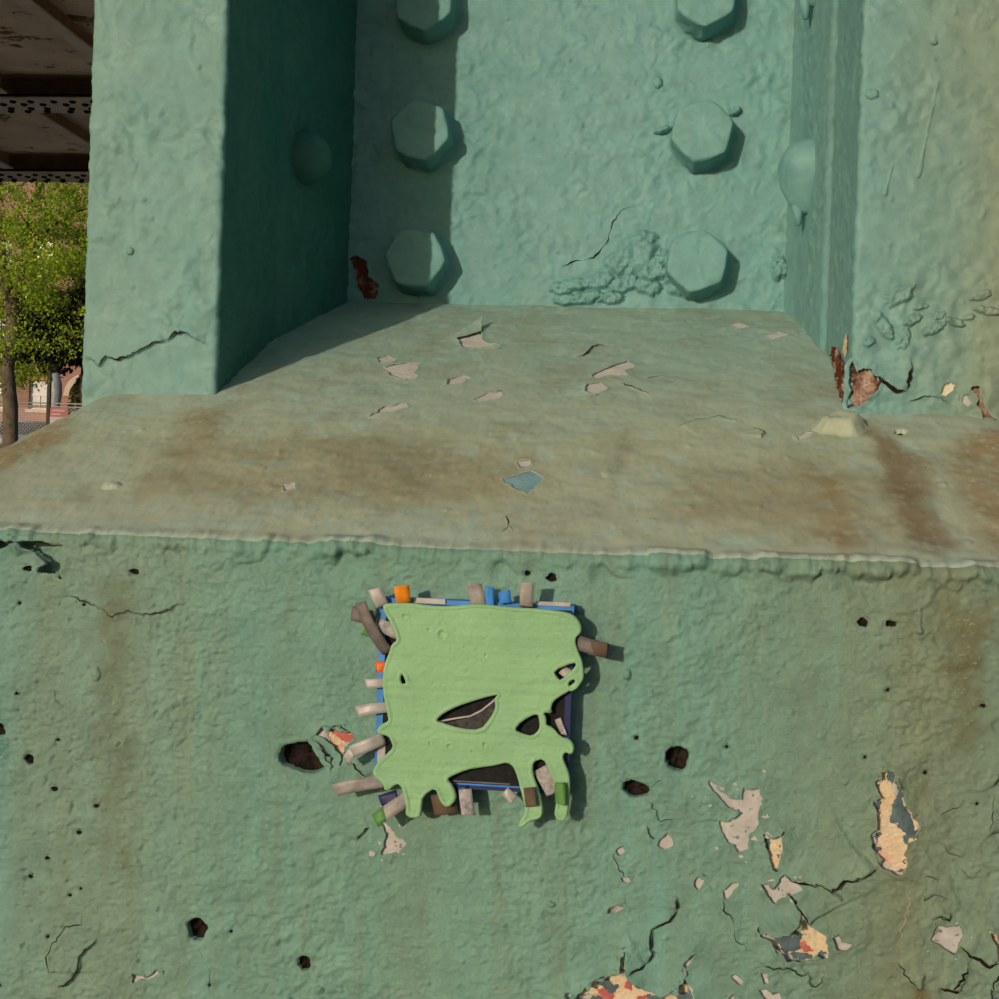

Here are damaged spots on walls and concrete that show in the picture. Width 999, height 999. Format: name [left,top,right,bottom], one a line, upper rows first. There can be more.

crack [91,331,206,366]
peeling [374,355,423,381]
peeling [581,360,638,396]
crack [62,595,186,617]
peeling [865,760,926,881]
peeling [689,872,743,904]
peeling [703,776,857,967]
crack [45,913,96,987]
peeling [567,947,700,999]
peeling [725,968,787,999]